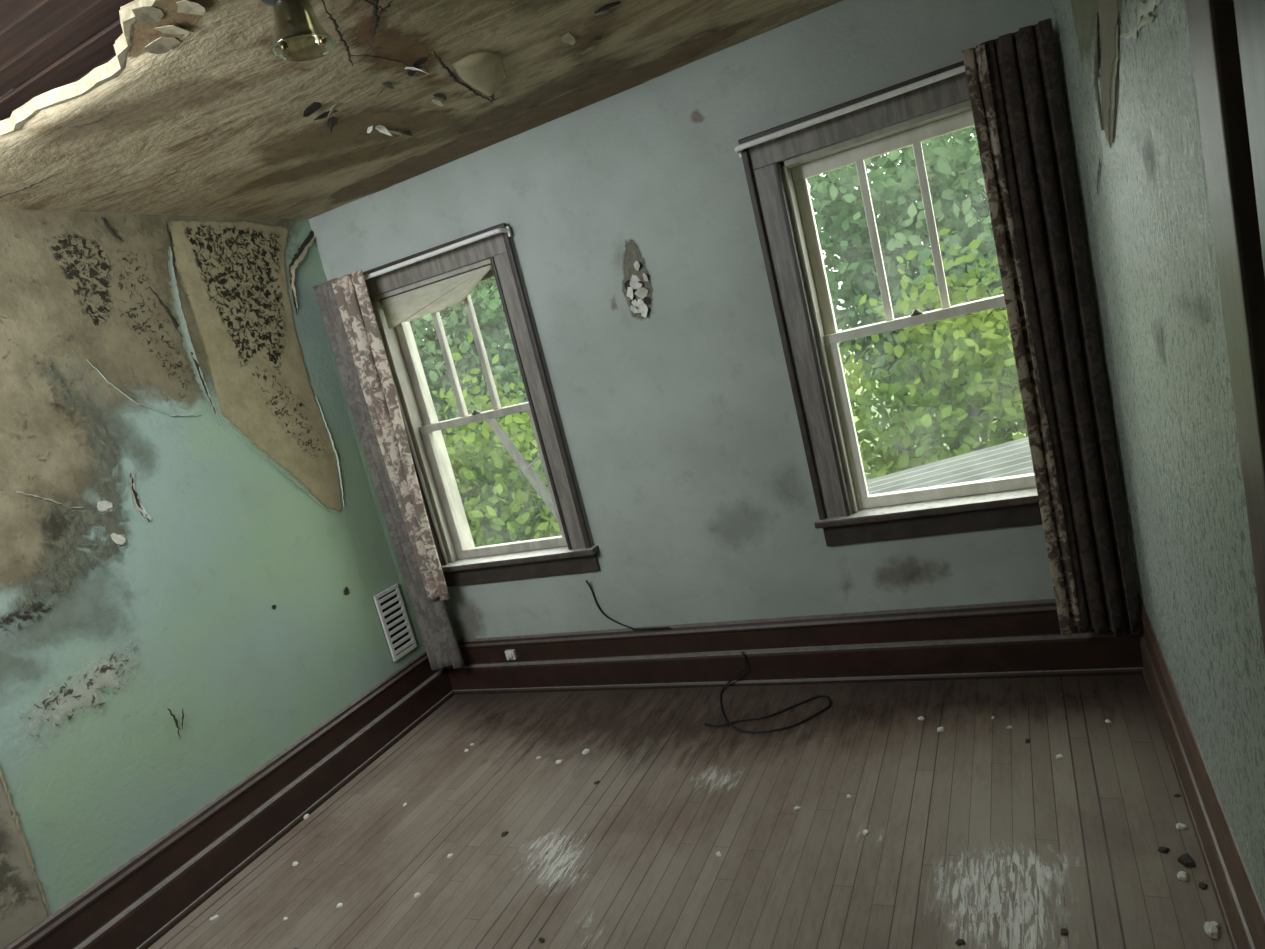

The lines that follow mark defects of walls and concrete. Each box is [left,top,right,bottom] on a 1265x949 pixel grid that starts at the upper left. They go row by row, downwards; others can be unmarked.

peeling [128,0,217,58]
peeling [303,102,343,134]
peeling [405,57,428,76]
water stain [234,8,754,203]
peeling [1093,0,1119,149]
crack [0,170,65,198]
water stain [185,225,324,457]
peeling [0,209,316,680]
water stain [0,600,54,630]
peeling [29,647,135,737]